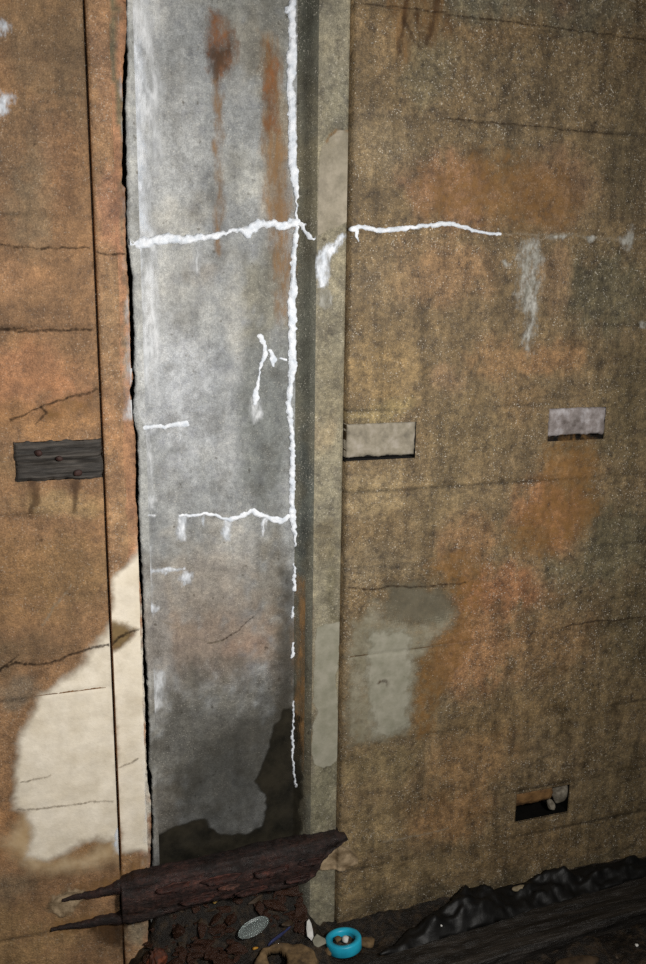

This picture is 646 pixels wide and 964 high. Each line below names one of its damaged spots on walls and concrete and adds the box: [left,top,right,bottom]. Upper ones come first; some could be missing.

corrosion [208,15,232,83]
damp [0,95,9,115]
corrosion [263,109,287,222]
damp [252,0,299,547]
crack [349,221,502,242]
damp [503,240,542,349]
crack [536,234,633,245]
crack [0,0,315,869]
peeling [7,554,149,871]
peeling [366,629,412,735]
damp [159,701,303,864]
crack [141,919,152,947]